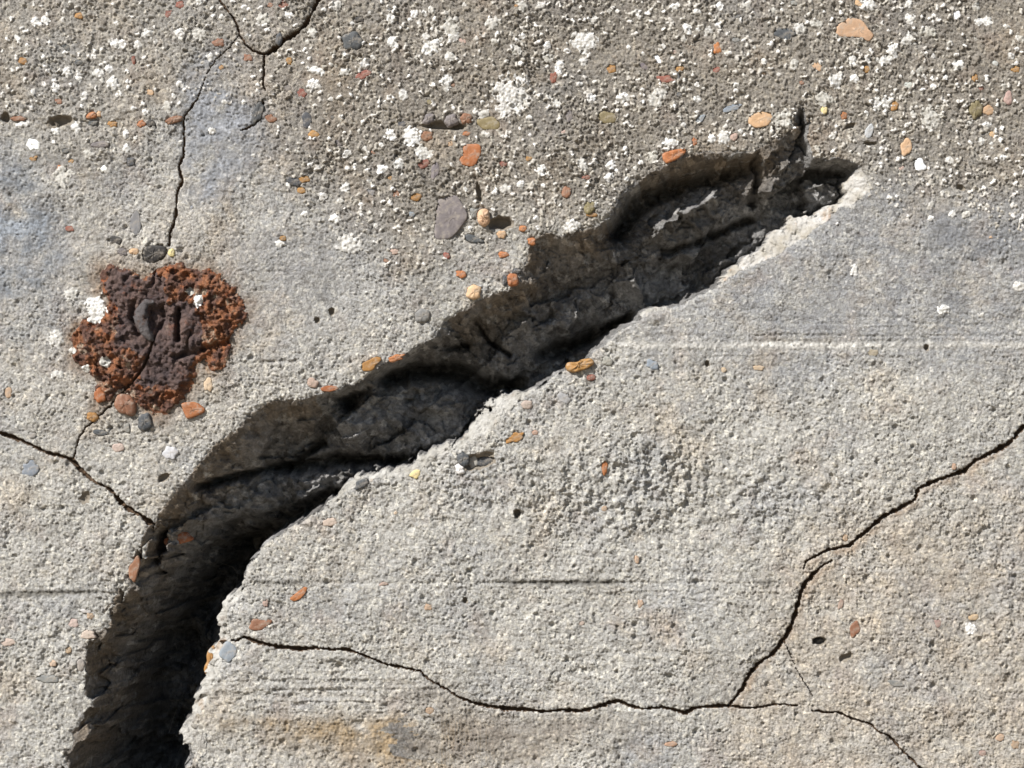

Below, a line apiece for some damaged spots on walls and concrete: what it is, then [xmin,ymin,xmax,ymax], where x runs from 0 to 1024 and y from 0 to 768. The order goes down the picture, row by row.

crack [168,0,321,246]
crack [0,342,159,530]
rust [68,262,248,417]
spalling [61,107,869,768]
crack [220,424,1024,768]